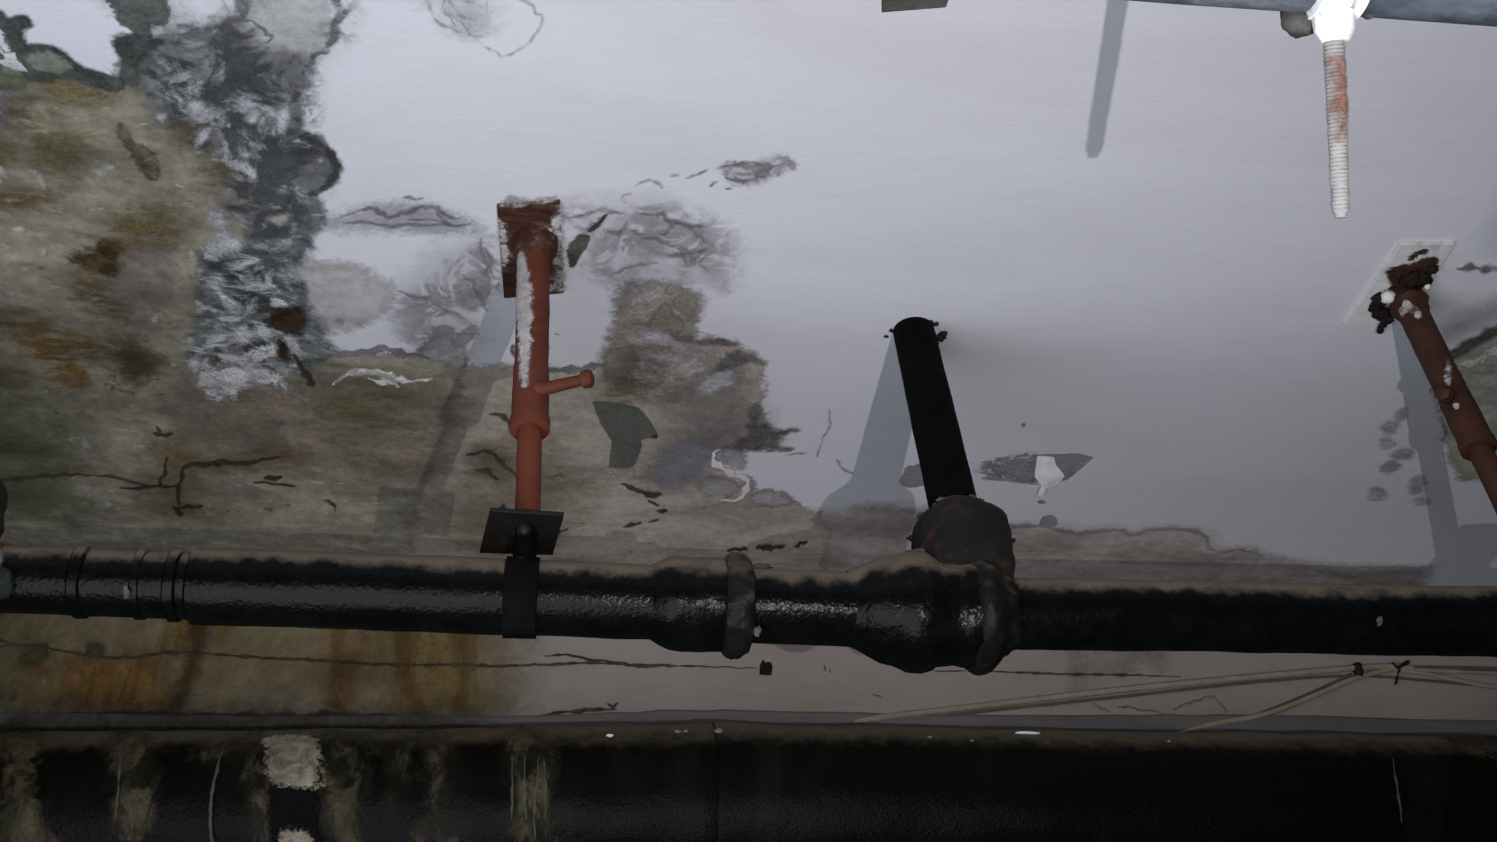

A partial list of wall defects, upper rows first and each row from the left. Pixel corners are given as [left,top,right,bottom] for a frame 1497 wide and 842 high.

damp [0,0,171,92]
damp [182,0,349,123]
damp [187,292,301,402]
peeling [0,17,517,559]
damp [292,261,394,330]
damp [592,206,738,406]
peeling [536,279,831,571]
crack [1,426,336,517]
peeling [899,463,924,488]
peeling [974,453,1092,528]
crack [0,639,756,669]
crack [544,702,618,715]